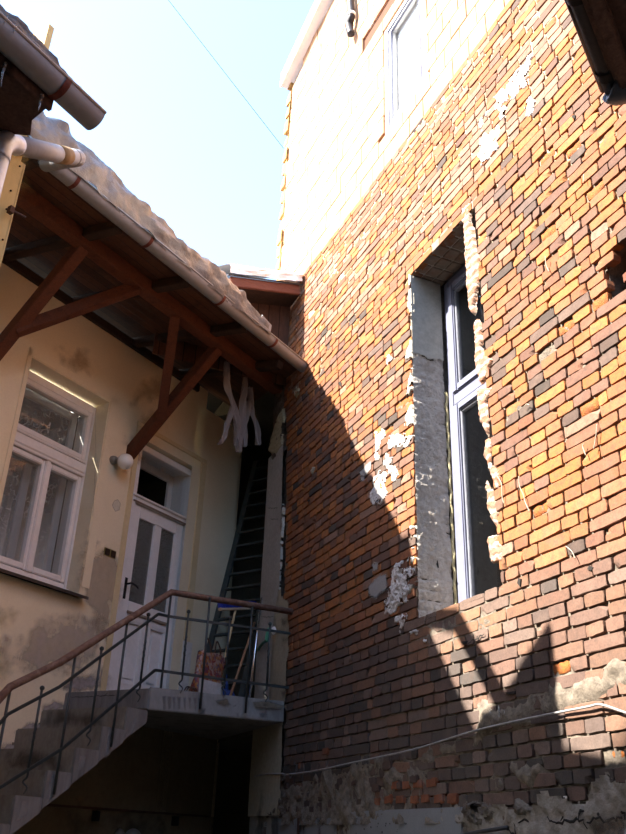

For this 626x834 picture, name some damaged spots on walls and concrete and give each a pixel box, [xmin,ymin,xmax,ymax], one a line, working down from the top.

peeling [477,104,507,166]
peeling [524,97,536,117]
spalling [608,245,626,291]
spalling [462,203,506,564]
peeling [370,340,415,505]
damp [21,551,117,669]
spalling [553,660,571,675]
crack [507,809,626,834]